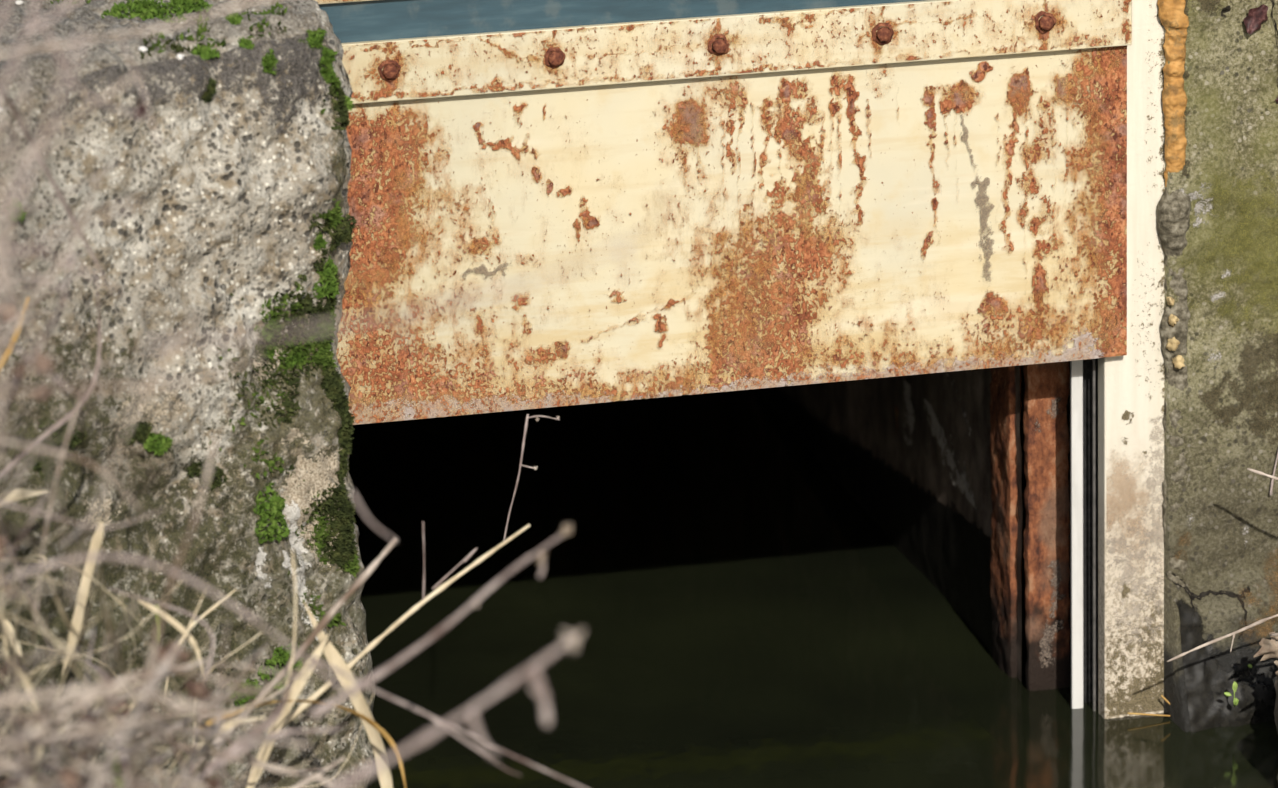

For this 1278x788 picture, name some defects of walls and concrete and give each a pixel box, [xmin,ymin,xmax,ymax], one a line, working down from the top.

crack [1256,0,1278,48]
corrosion [336,0,1132,425]
water stain [960,115,994,292]